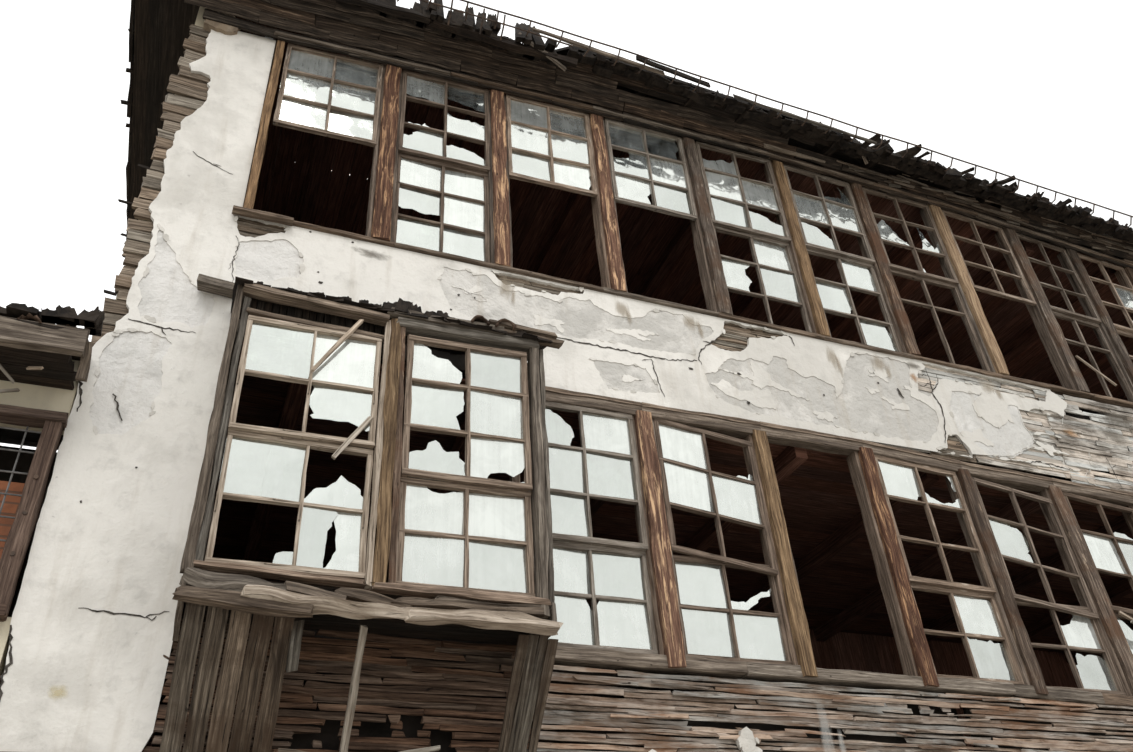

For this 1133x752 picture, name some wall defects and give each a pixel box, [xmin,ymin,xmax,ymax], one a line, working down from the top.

peeling [0,224,215,435]
crack [557,337,719,397]
peeling [438,267,1064,474]
crack [85,608,169,621]